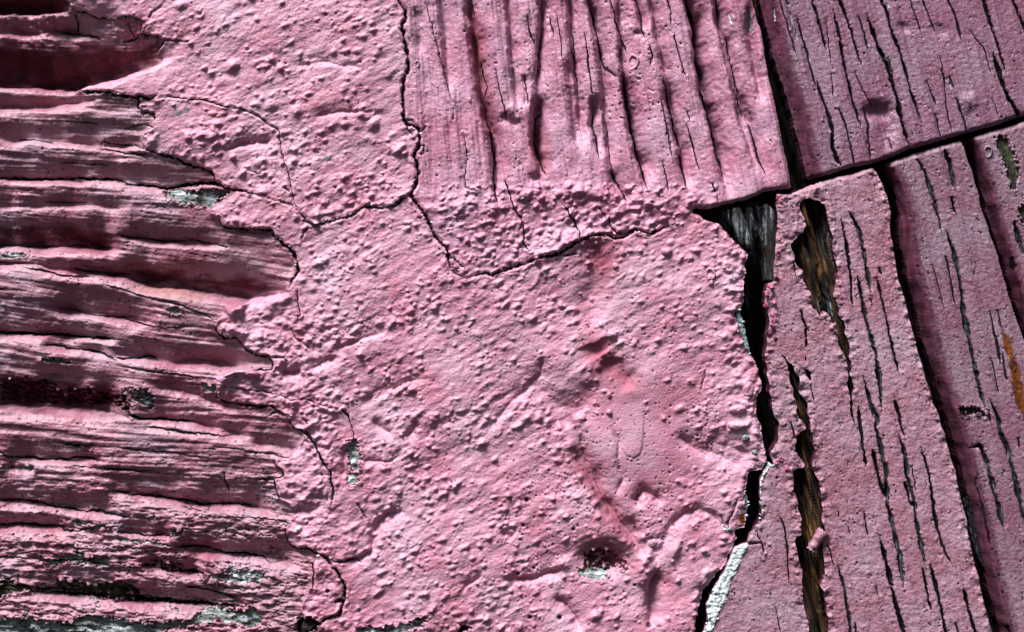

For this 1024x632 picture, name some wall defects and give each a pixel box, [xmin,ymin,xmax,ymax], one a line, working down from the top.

peeling [994,133,1019,190]
peeling [164,186,230,208]
crack [0,0,677,504]
crack [286,535,362,632]
peeling [579,546,627,581]
peeling [806,527,829,553]